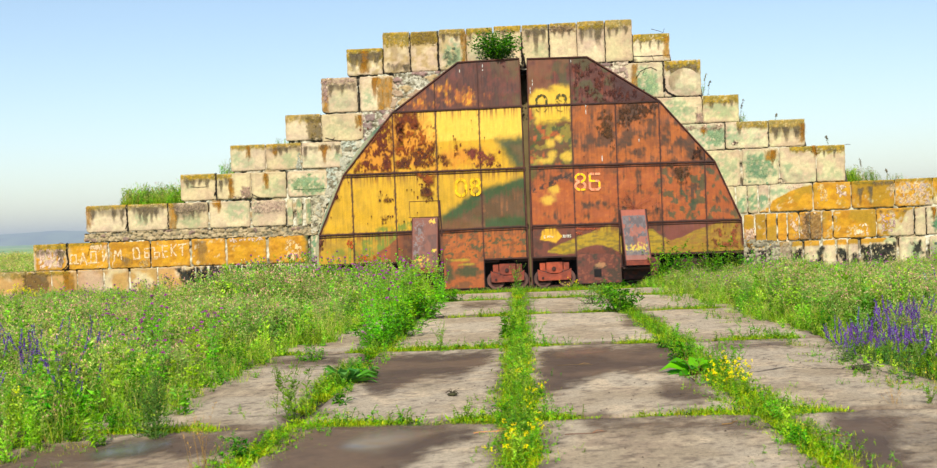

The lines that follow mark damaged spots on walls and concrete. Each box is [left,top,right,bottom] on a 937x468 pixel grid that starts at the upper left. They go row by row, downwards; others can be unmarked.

damp [350,52,410,70]
corrosion [572,60,658,147]
corrosion [354,51,501,202]
corrosion [670,147,703,183]
damp [112,206,163,221]